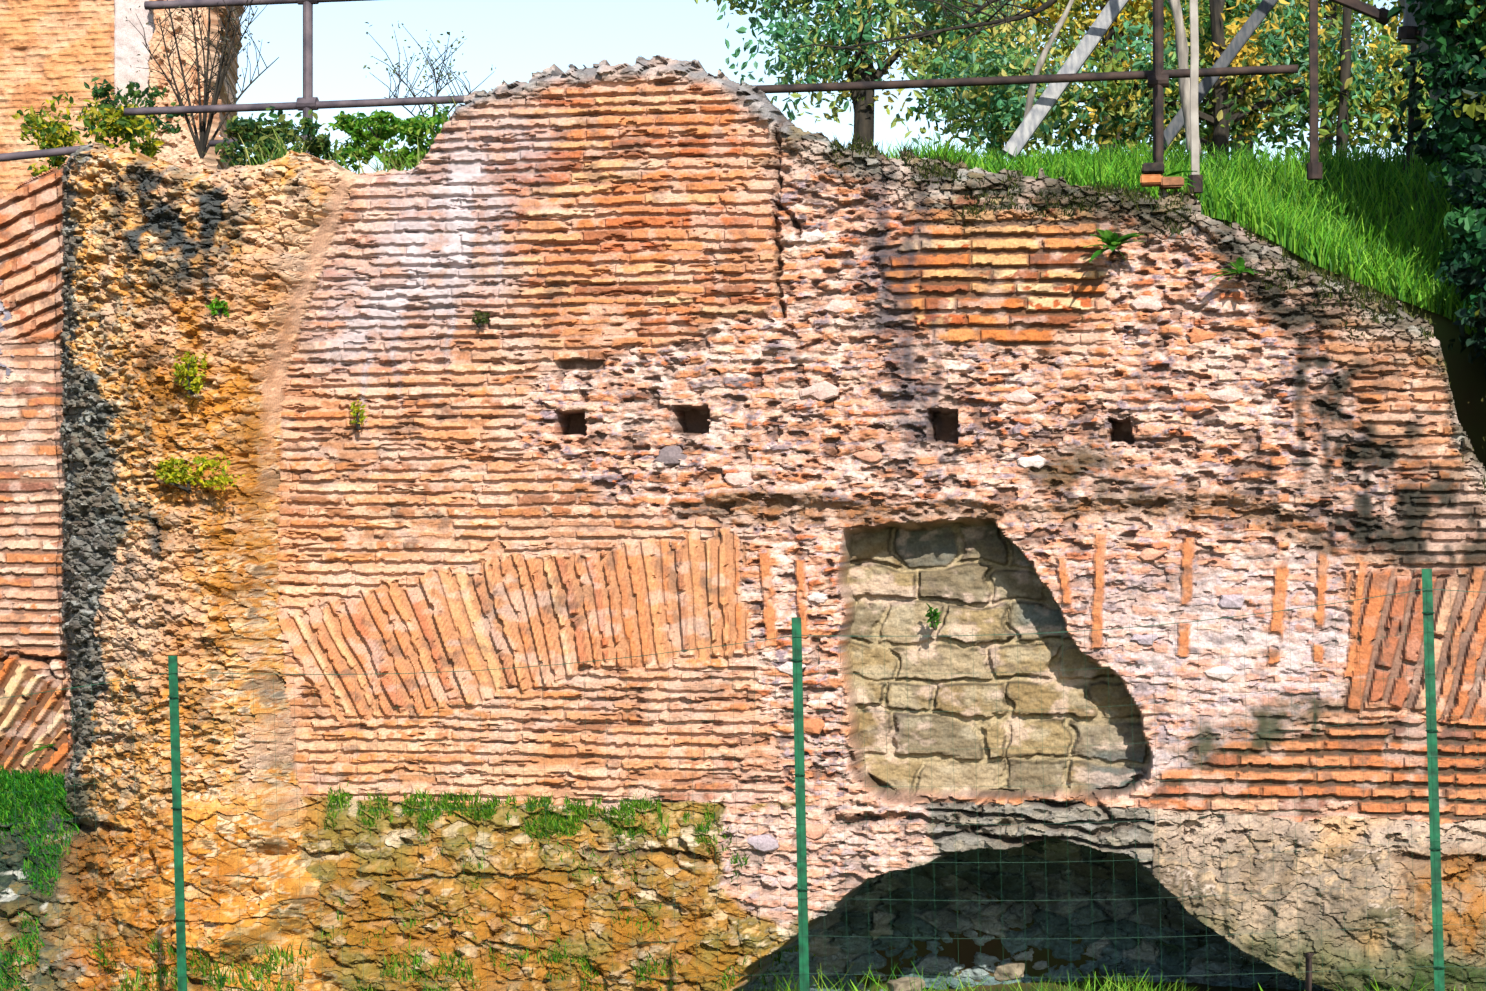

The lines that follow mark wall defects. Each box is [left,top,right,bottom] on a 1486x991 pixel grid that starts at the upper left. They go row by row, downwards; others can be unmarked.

crack [771,116,802,319]
peeling [0,279,13,391]
spalling [517,147,1402,929]